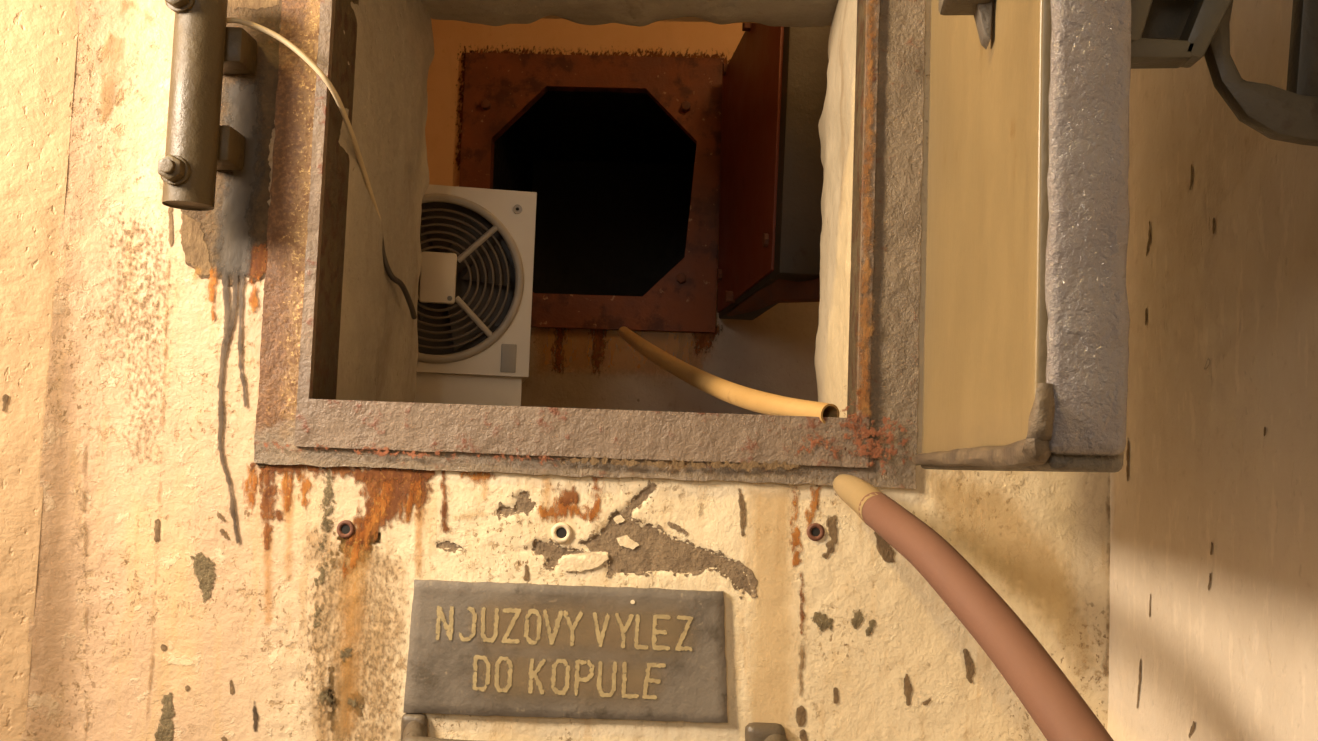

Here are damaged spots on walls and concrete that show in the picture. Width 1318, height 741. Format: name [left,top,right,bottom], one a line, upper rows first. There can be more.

rust [208,268,217,321]
water stain [216,79,264,543]
rust [244,0,912,577]
peeling [190,552,216,603]
water stain [306,526,402,741]
peeling [524,481,758,599]
peeling [154,685,190,741]